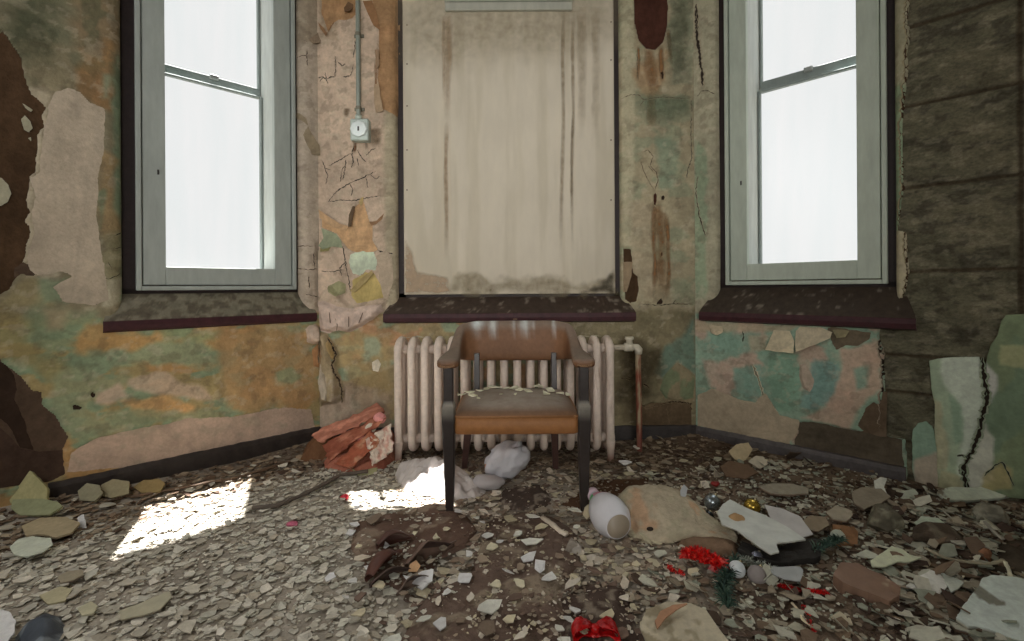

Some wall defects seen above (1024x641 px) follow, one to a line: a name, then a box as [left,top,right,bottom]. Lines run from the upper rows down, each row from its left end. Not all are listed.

crack [297,41,356,83]
peeling [634,0,668,50]
peeling [0,32,109,305]
crack [322,144,381,203]
crack [622,4,715,236]
peeling [318,197,394,303]
water stain [406,253,448,293]
water stain [592,275,613,293]
spalling [642,0,1024,481]
peeling [0,359,315,488]
crack [317,338,344,403]
crack [957,357,1014,487]